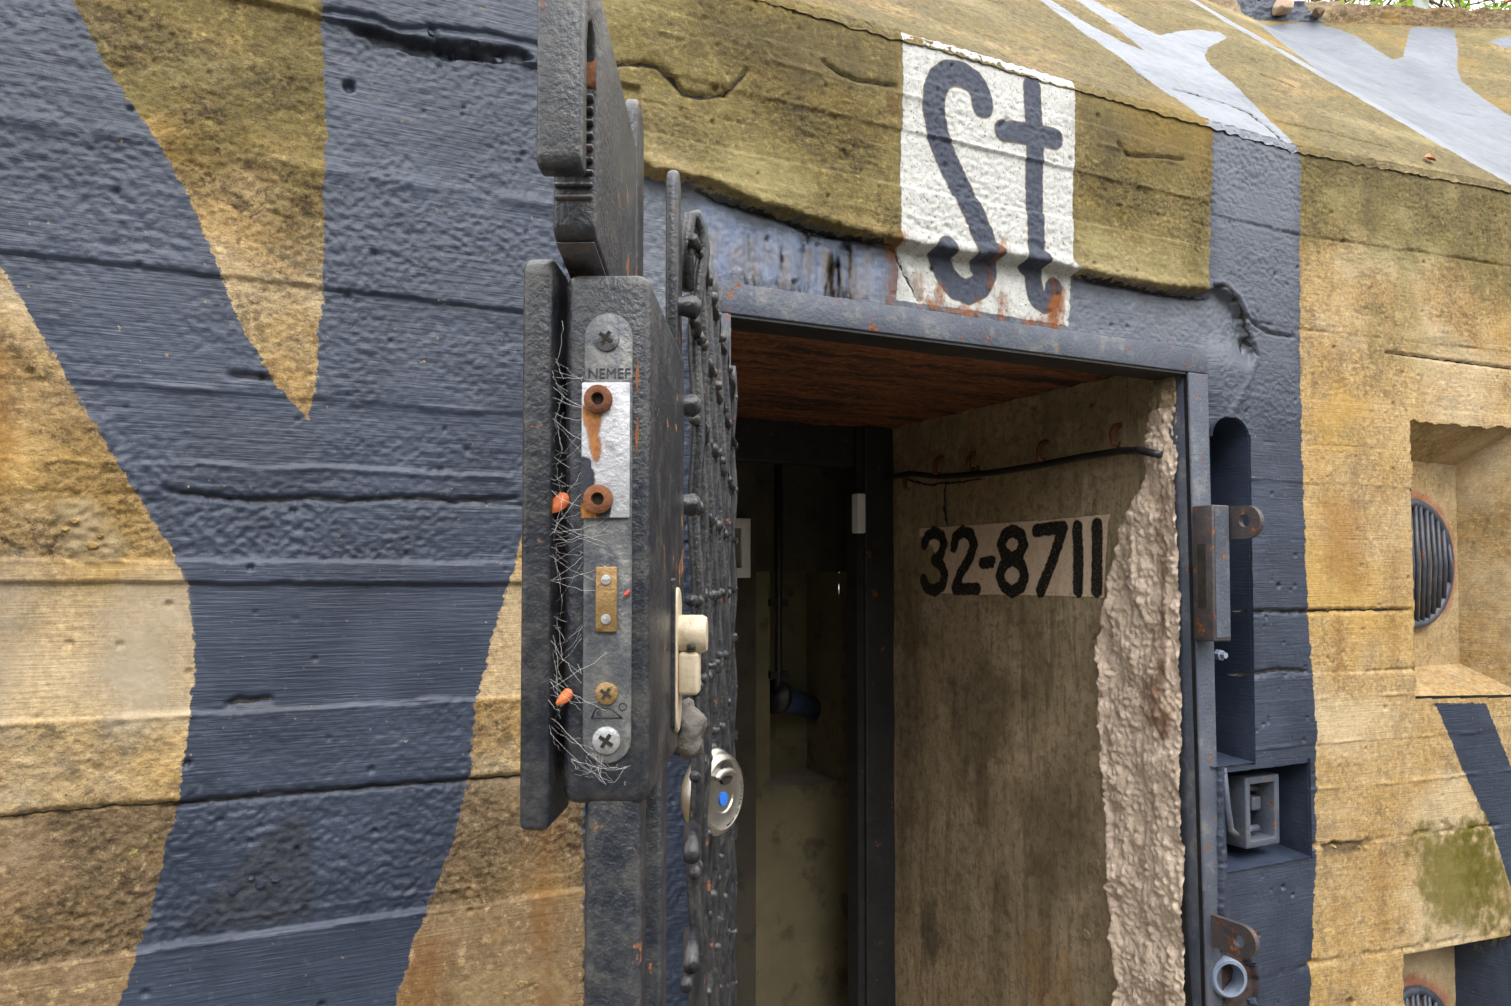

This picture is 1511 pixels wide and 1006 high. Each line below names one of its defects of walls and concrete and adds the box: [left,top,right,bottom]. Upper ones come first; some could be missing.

crack [617,63,746,100]
corrosion [927,284,979,317]
corrosion [998,293,1064,329]